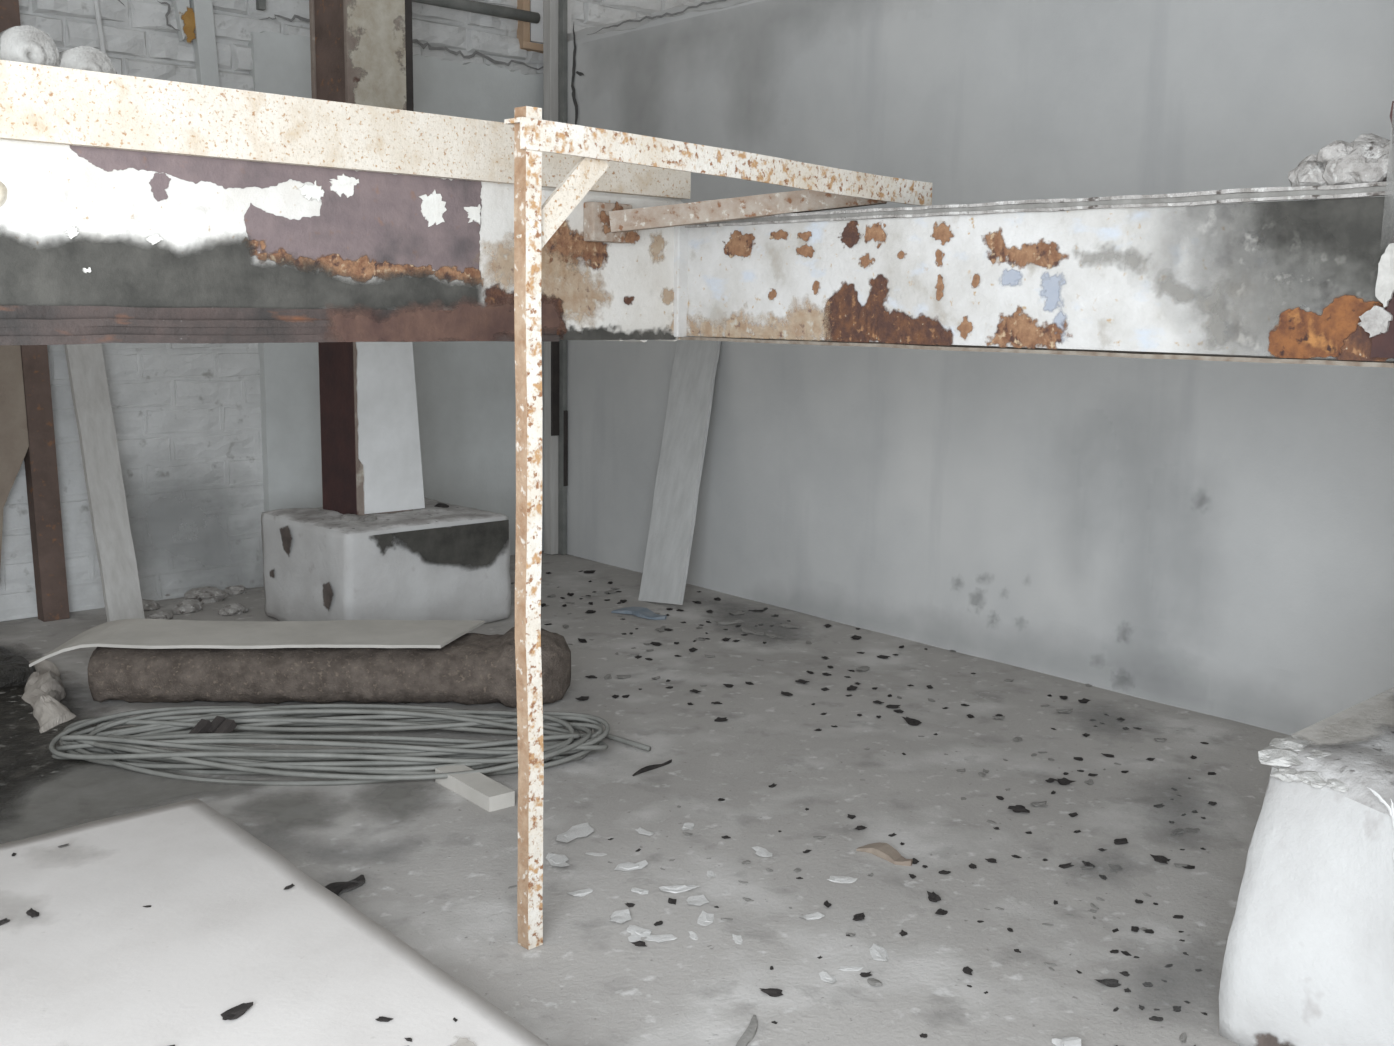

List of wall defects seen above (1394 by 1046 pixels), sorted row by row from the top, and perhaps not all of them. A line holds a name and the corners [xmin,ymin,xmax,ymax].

peeling [64,226,79,239]
peeling [69,145,482,273]
corrosion [249,240,515,342]
corrosion [541,202,664,338]
corrosion [663,221,973,346]
corrosion [983,229,1068,269]
corrosion [987,306,1067,349]
damp [1076,250,1140,269]
damp [1160,276,1228,345]
corrosion [1268,293,1394,362]
peeling [1358,243,1394,338]
spalling [1258,688,1394,792]